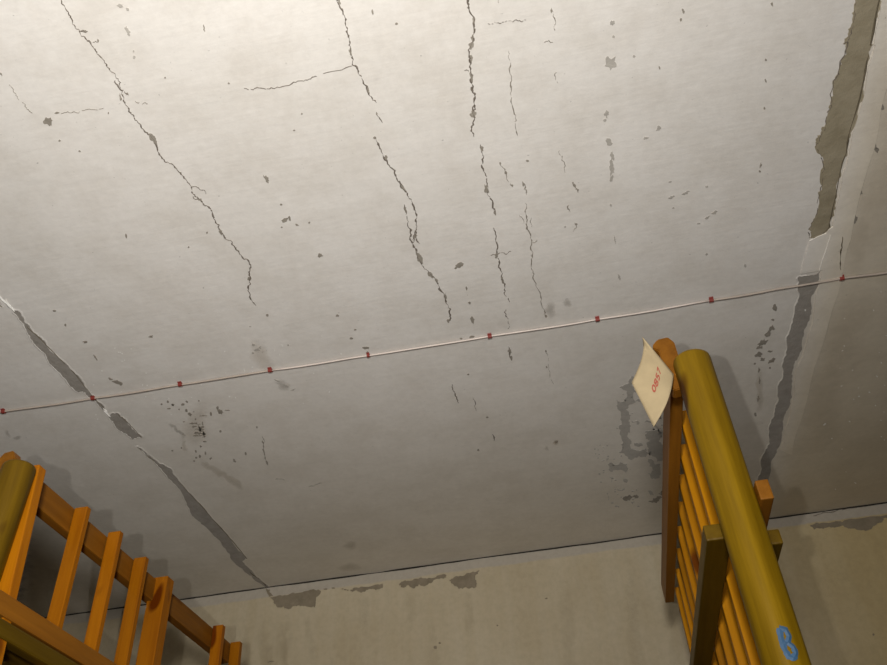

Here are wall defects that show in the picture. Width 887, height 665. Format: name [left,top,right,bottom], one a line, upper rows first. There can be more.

crack [0,0,268,316]
crack [244,0,451,323]
crack [464,0,547,360]
spalling [808,0,881,238]
spalling [0,296,383,609]
flaking render [399,570,479,589]
peeling [594,376,663,507]
spalling [754,272,820,481]